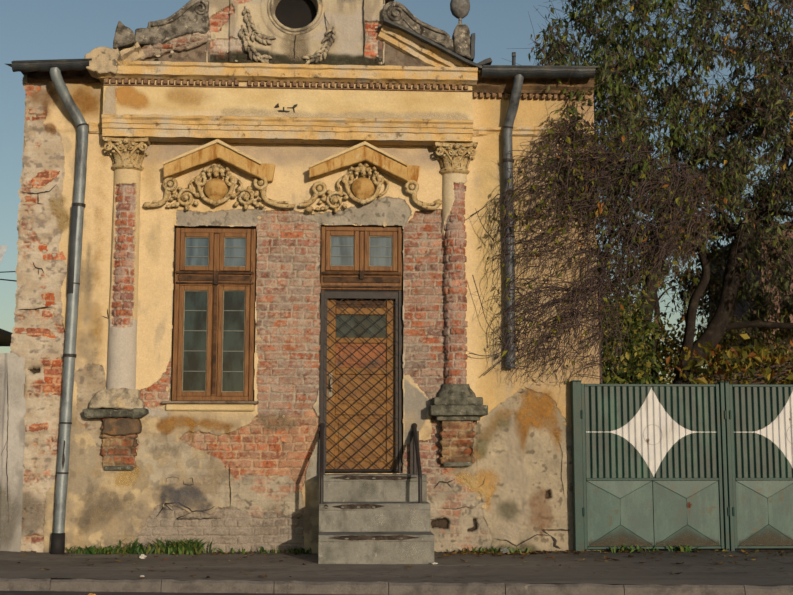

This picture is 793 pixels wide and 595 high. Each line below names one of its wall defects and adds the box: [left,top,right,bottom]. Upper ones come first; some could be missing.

flaking render [140,0,251,62]
flaking render [111,183,137,327]
flaking render [10,74,68,552]
flaking render [74,363,135,473]
water stain [162,486,210,511]
crack [156,468,231,520]
flaking render [135,180,468,553]
peeling [332,389,574,552]
crack [497,529,569,549]